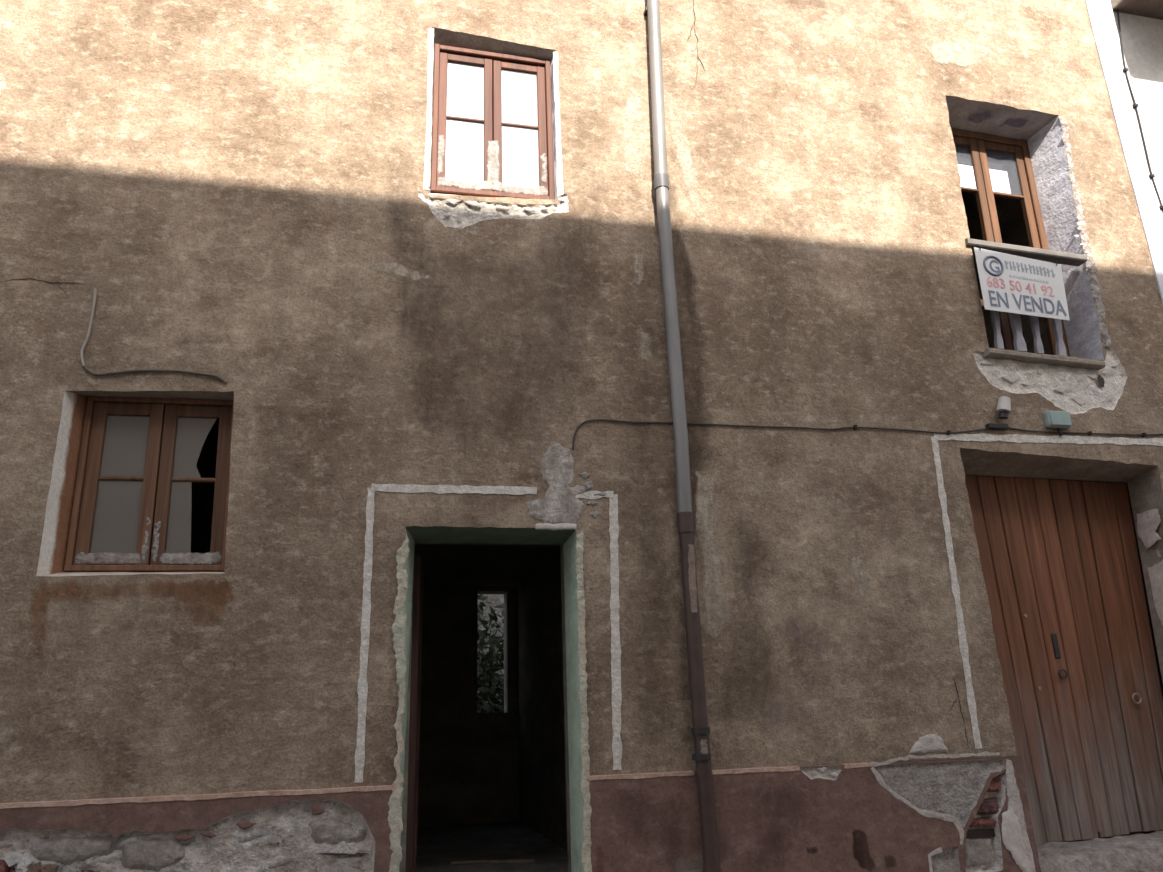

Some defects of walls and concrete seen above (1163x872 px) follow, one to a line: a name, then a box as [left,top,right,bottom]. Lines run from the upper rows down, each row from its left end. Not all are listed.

crack [687,0,706,85]
flaking render [418,28,569,229]
flaking render [972,116,1127,414]
corrosion [32,581,233,638]
peeling [75,517,221,565]
flaking render [1137,509,1163,626]
peeling [388,535,410,872]
peeling [535,523,592,872]
spalling [0,799,376,872]
flaking render [800,767,842,780]
leakage [852,830,875,869]
flaking render [870,751,1036,872]